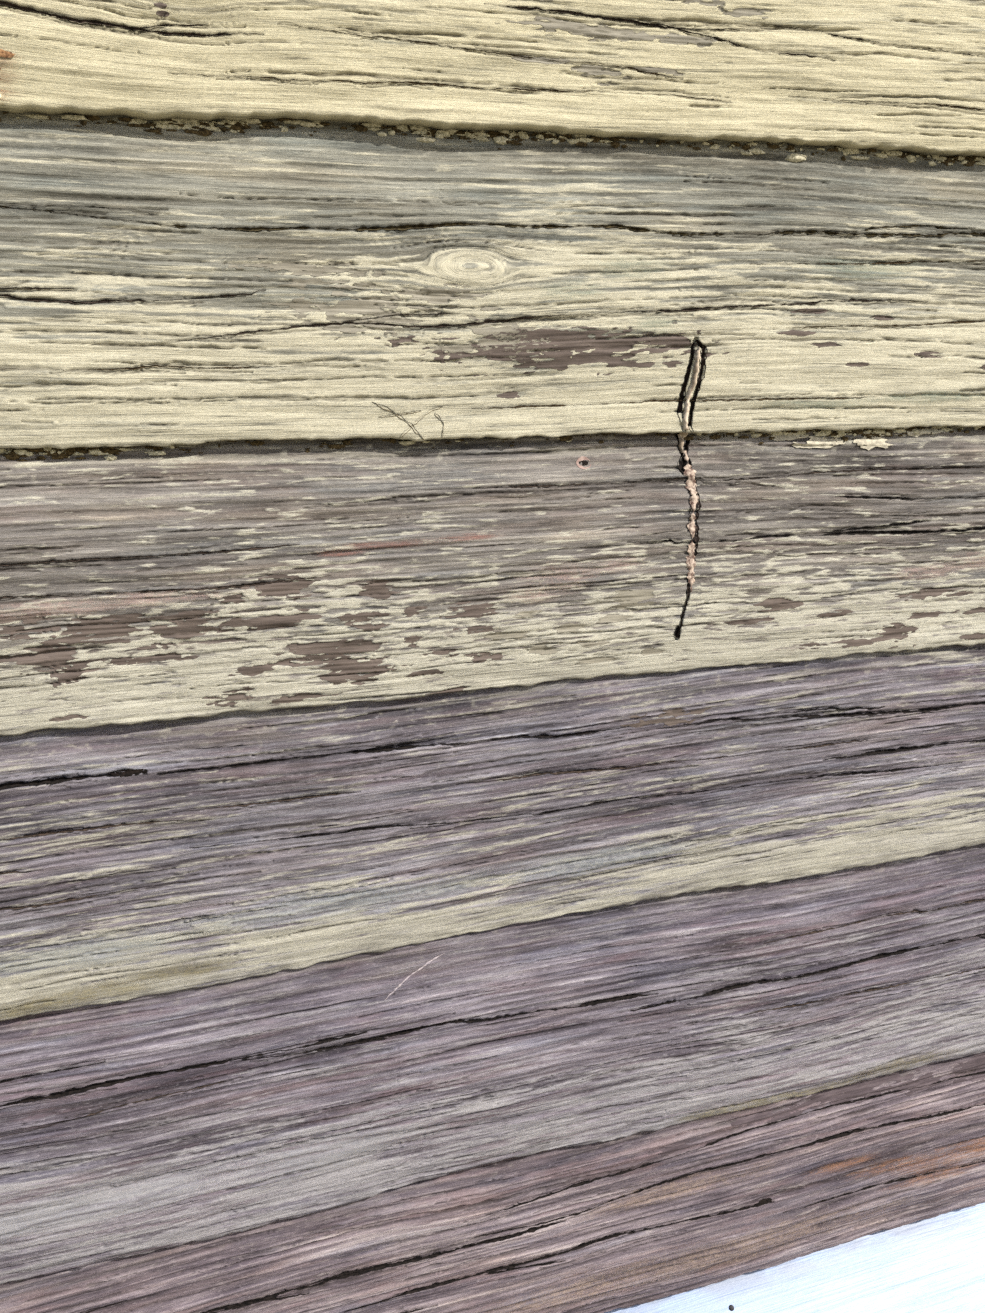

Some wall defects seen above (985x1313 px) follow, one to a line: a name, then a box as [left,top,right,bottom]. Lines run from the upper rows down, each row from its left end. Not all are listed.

crack [0,287,266,304]
peeling [228,254,730,377]
crack [0,205,985,265]
crack [0,299,985,639]
peeling [0,574,656,707]
peeling [724,598,853,625]
peeling [799,588,985,649]
crack [0,702,985,848]
crack [0,879,206,910]
crack [767,899,985,943]
crack [0,933,985,1137]
crack [202,1071,985,1313]